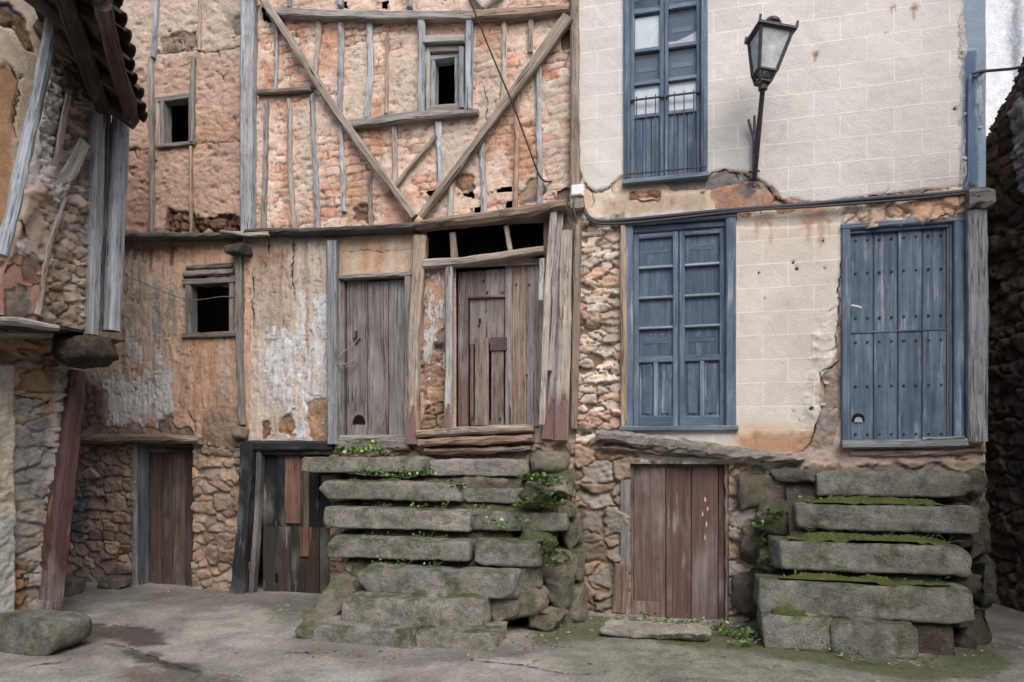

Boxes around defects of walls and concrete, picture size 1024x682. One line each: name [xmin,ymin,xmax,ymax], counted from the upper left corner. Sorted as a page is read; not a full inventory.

flaking render [164,208,240,233]
flaking render [630,173,819,218]
peeling [103,247,230,436]
peeling [259,285,327,441]
peeling [406,269,450,444]
crack [791,263,841,454]